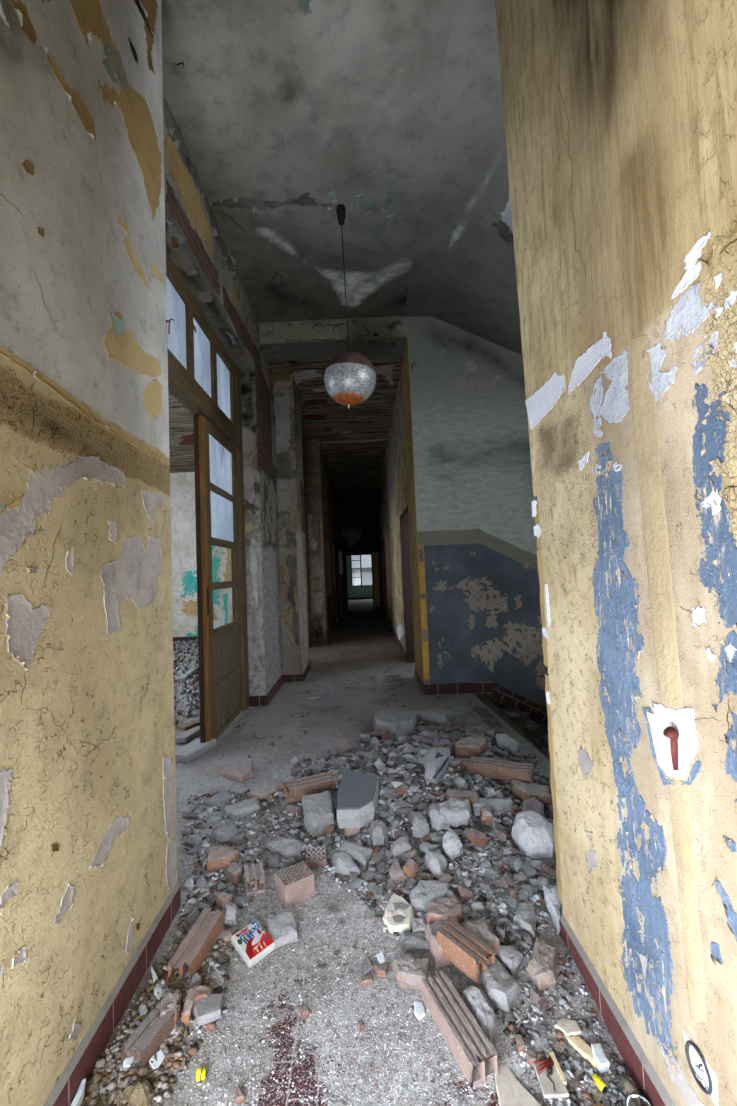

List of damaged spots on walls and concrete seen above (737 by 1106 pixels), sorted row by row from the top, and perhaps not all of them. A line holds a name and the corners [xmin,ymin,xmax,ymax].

peeling [0,0,96,141]
peeling [69,0,337,675]
peeling [0,452,127,580]
peeling [642,215,737,783]
peeling [4,593,51,670]
peeling [432,560,551,705]
peeling [525,331,703,1106]
peeling [0,764,13,865]
peeling [162,756,176,895]
peeling [710,942,723,966]
peeling [714,875,737,942]
peeling [723,835,737,852]